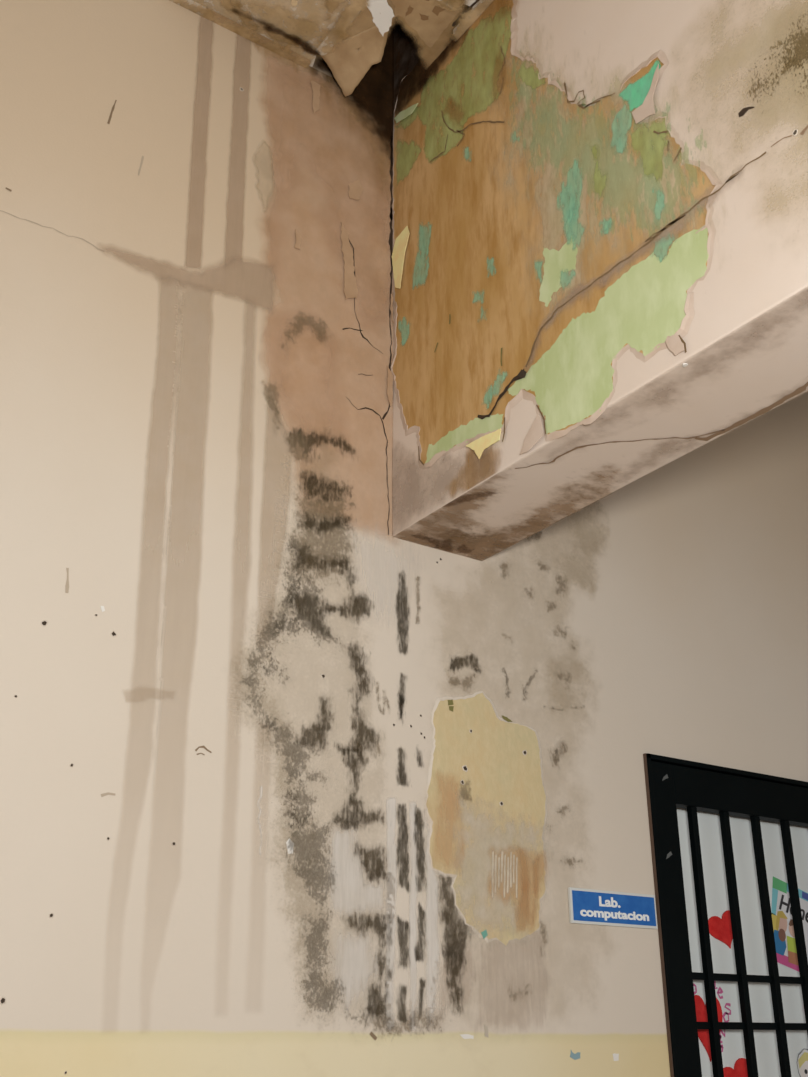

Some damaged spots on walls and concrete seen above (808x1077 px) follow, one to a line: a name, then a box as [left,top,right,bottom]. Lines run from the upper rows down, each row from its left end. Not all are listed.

crack [738,107,754,117]
damp [707,0,808,153]
crack [0,187,104,252]
damp [107,0,605,584]
peeling [391,0,723,469]
crack [478,125,808,419]
damp [296,698,331,748]
damp [294,593,370,636]
damp [396,574,420,654]
damp [450,655,480,684]
damp [333,647,468,1030]
peeling [425,691,547,947]